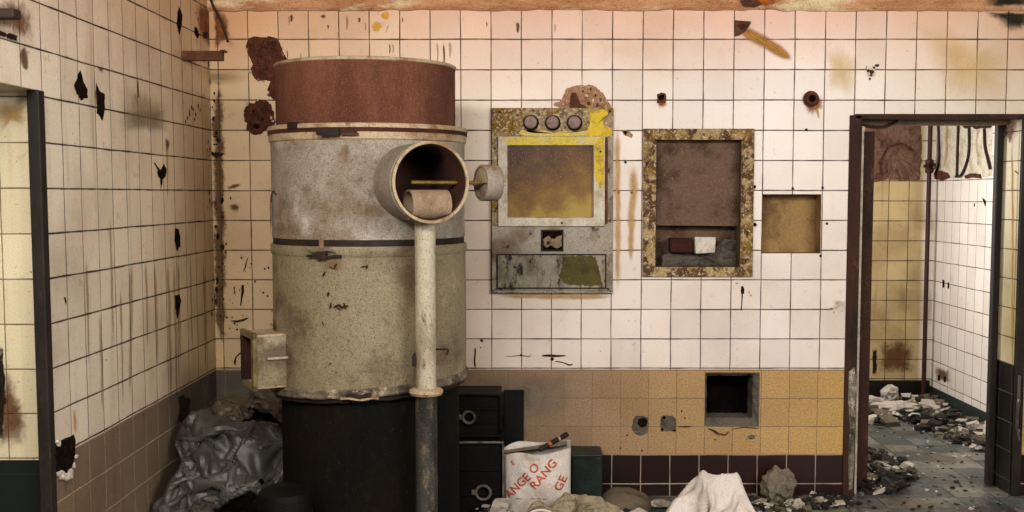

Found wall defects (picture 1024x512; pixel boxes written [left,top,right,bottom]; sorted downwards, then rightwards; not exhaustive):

flaking render [243,36,287,135]
flaking render [553,84,611,108]
spalling [154,162,167,186]
spalling [632,415,676,436]
spalling [54,411,79,481]